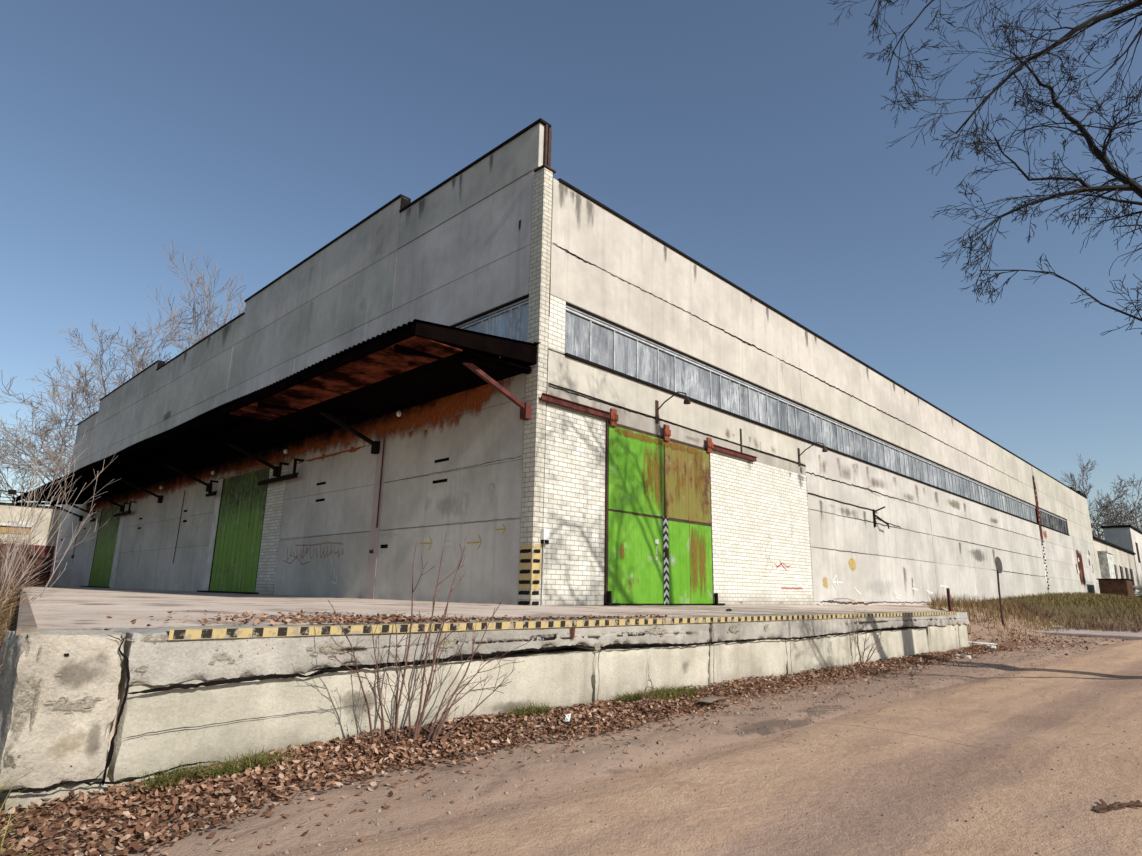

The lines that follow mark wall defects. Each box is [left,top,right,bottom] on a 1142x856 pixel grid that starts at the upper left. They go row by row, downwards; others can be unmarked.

corrosion [86,378,510,512]
corrosion [615,430,703,508]
corrosion [1032,477,1047,540]
corrosion [691,529,706,591]
crack [0,434,1044,793]